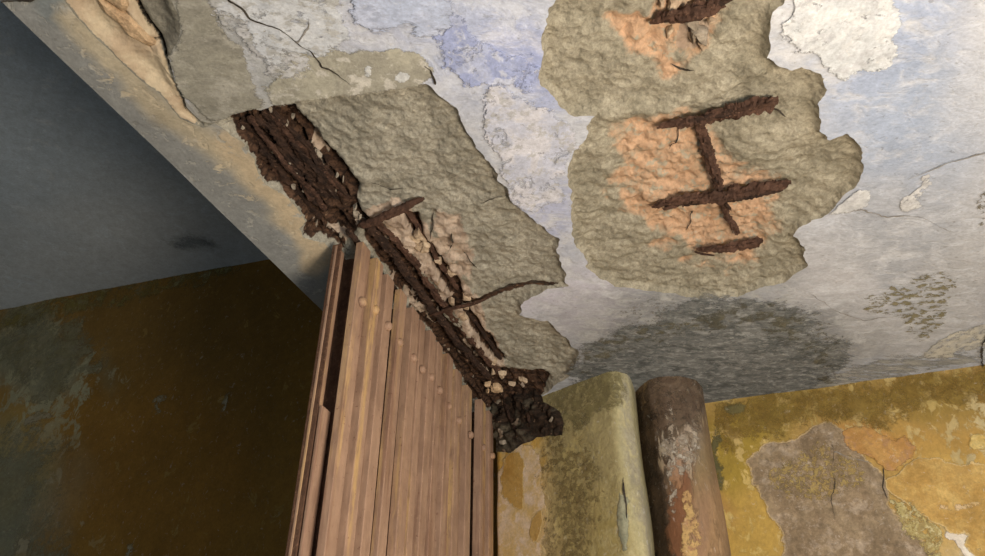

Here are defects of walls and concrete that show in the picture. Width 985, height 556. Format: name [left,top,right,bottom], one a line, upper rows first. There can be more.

crack [228,0,349,84]
peeling [777,0,902,81]
spalling [348,0,864,299]
peeling [830,190,871,215]
crack [908,153,985,180]
leakage [0,266,232,329]
spalling [64,0,579,556]
leakage [547,292,985,556]
peeling [617,493,629,551]
peeling [660,409,702,556]
flaking render [746,421,985,556]